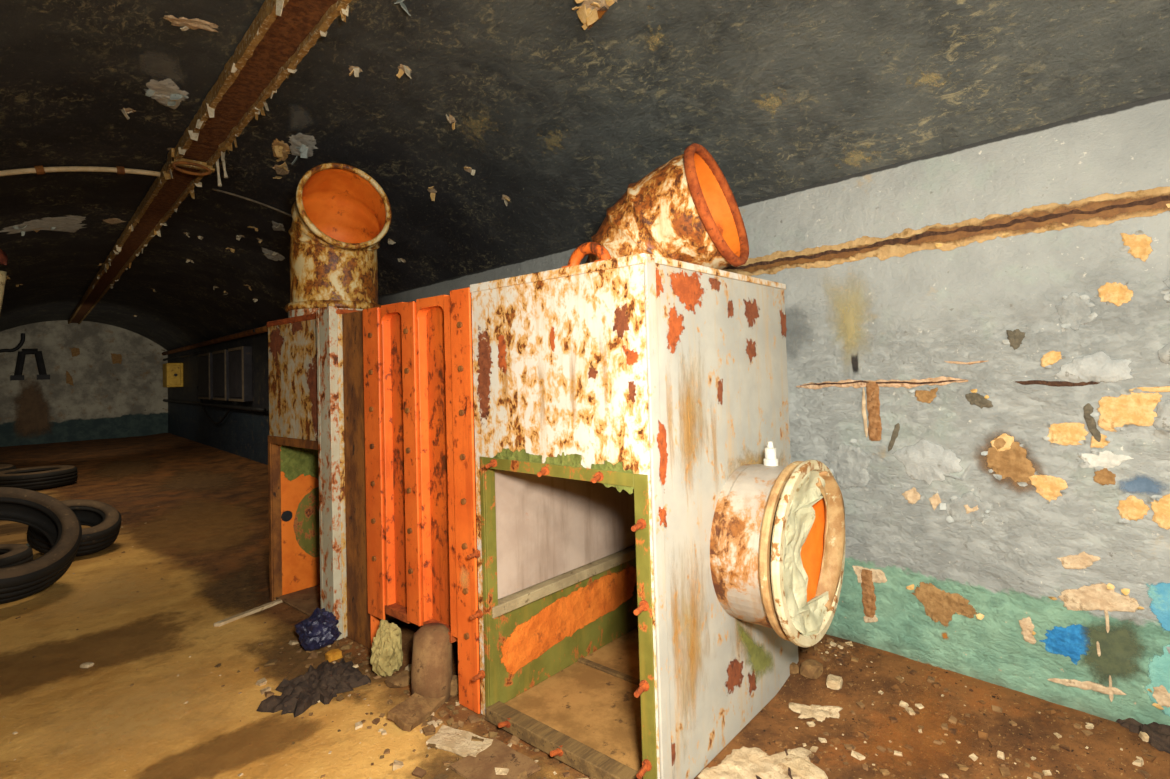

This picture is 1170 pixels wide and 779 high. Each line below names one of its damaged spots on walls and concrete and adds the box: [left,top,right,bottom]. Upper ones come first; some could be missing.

peeling [163,15,219,32]
peeling [572,0,618,30]
peeling [141,53,189,109]
peeling [0,215,87,236]
flaking render [722,187,1170,276]
peeling [1055,281,1133,330]
spalling [1043,388,1162,485]
spalling [979,433,1068,504]
spalling [1117,494,1170,530]
spalling [906,582,985,627]
spalling [1018,582,1170,717]
leakage [1084,607,1145,702]